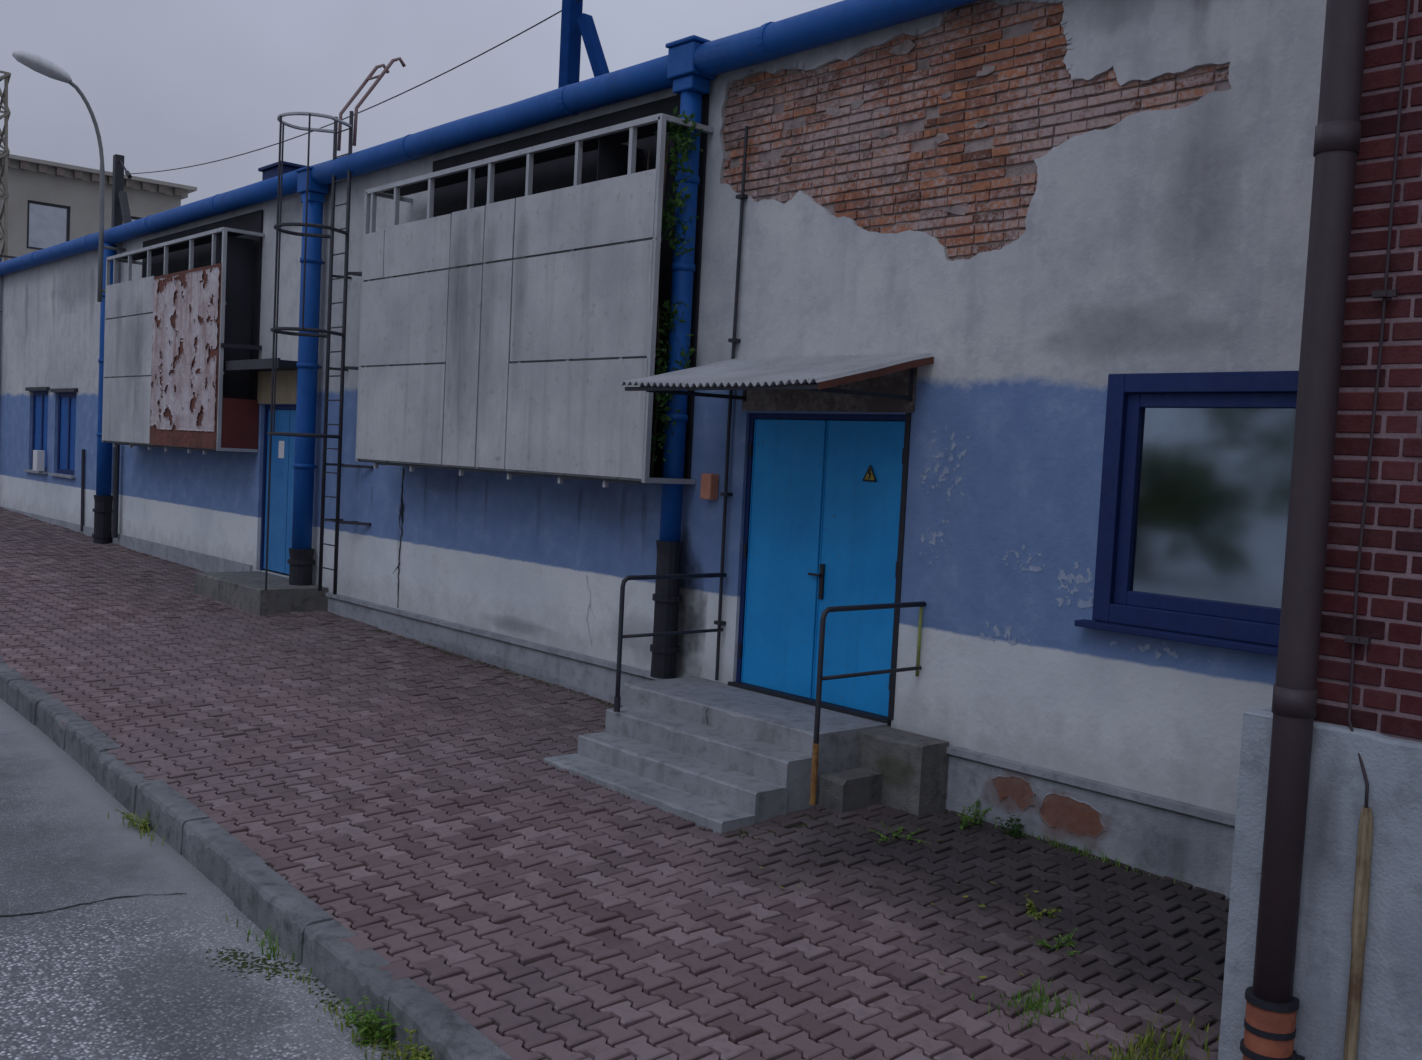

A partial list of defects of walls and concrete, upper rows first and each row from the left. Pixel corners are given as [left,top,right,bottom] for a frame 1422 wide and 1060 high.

spalling [722,0,1231,261]
spalling [992,775,1107,839]